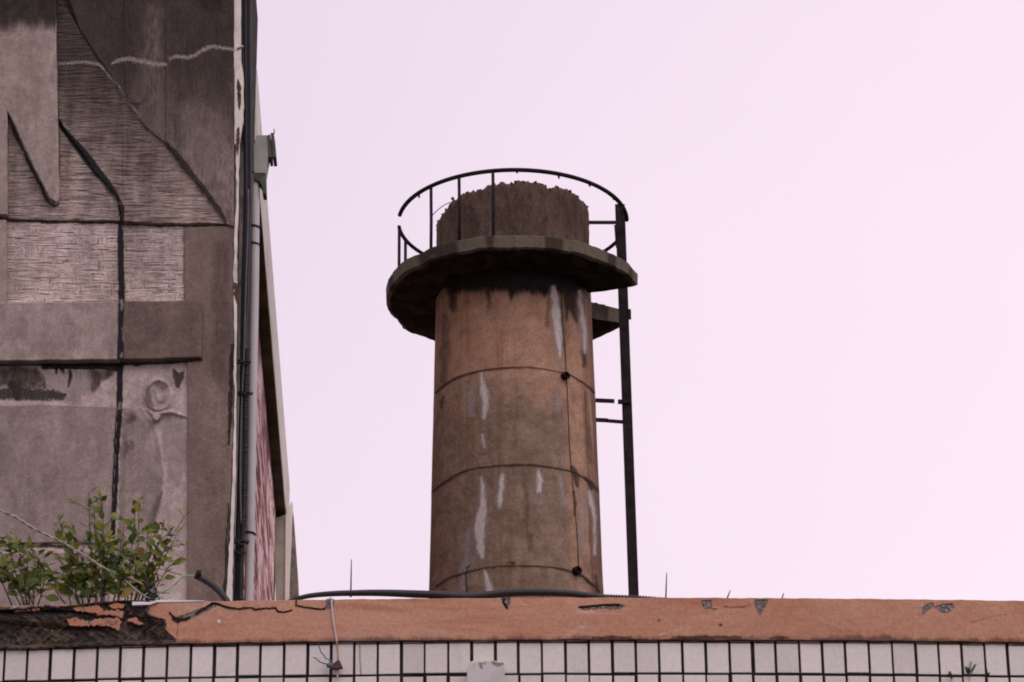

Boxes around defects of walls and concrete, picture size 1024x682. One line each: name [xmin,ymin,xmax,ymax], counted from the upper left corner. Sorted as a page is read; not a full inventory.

efflorescence [551,286,562,357]
efflorescence [578,290,588,353]
water stain [0,363,118,401]
efflorescence [457,373,489,419]
efflorescence [459,474,504,592]
water stain [558,465,596,554]
flaking render [0,600,176,649]
crack [169,599,326,636]
flaking render [754,599,768,615]
flaking render [922,603,954,614]